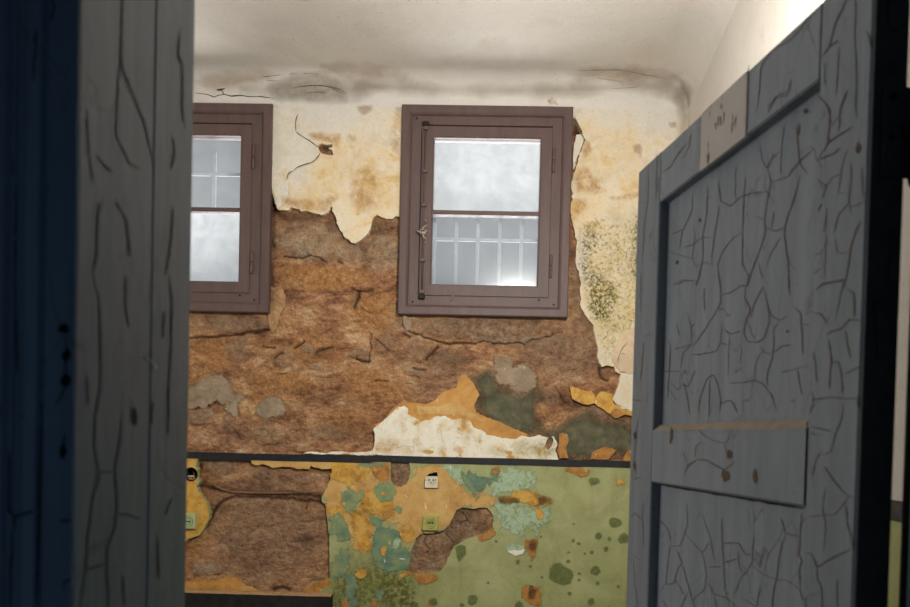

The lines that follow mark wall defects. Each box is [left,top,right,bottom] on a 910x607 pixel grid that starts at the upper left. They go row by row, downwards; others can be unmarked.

crack [7,0,270,607]
spalling [185,107,637,593]
leakage [582,221,638,329]